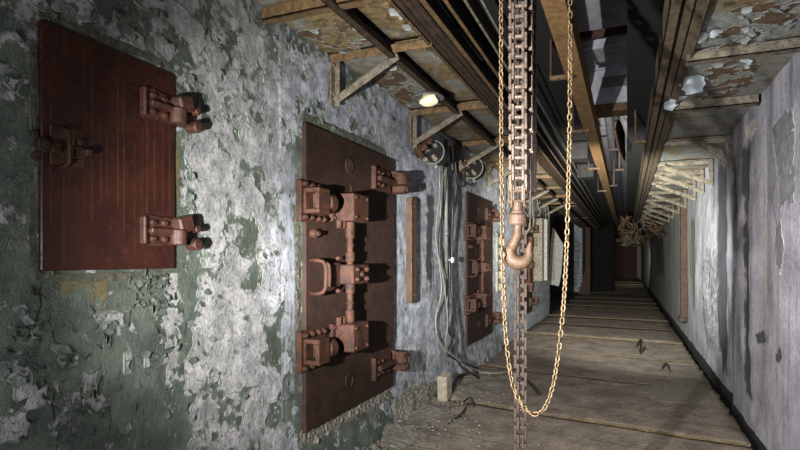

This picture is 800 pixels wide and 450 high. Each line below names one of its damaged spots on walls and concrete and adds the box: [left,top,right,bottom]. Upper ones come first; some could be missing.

peeling [0,28,30,97]
peeling [664,59,766,111]
peeling [697,0,800,51]
peeling [28,0,464,450]
water stain [691,142,768,398]
peeling [0,303,78,445]